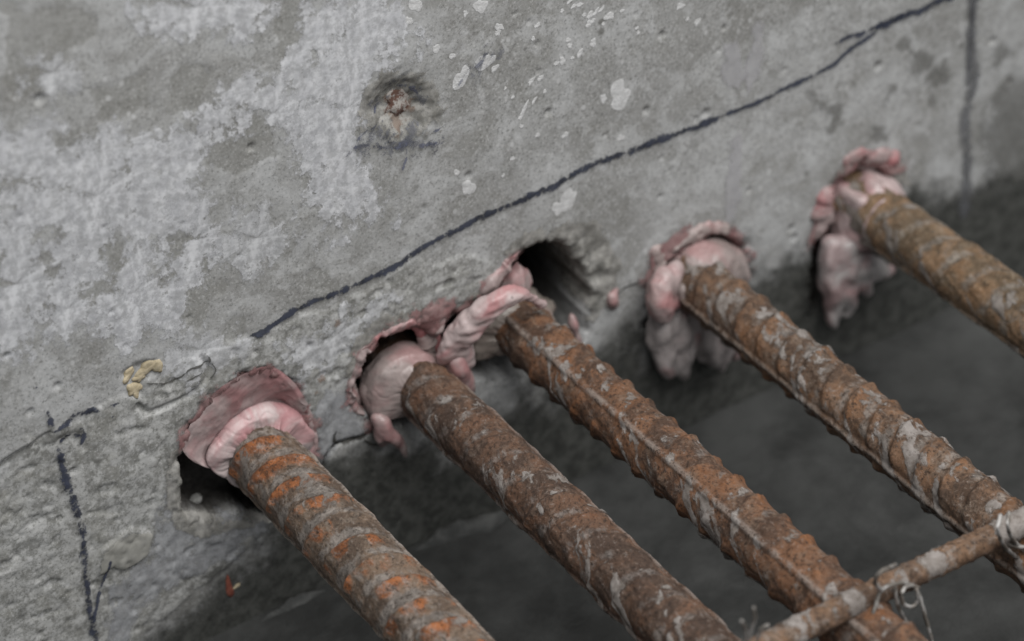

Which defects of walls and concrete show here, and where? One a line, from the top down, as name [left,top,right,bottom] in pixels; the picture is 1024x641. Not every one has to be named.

efflorescence [0,0,431,395]
spalling [164,426,495,641]
spalling [343,307,441,380]
spalling [504,219,623,330]
spalling [400,256,1024,641]
spalling [819,164,1024,358]